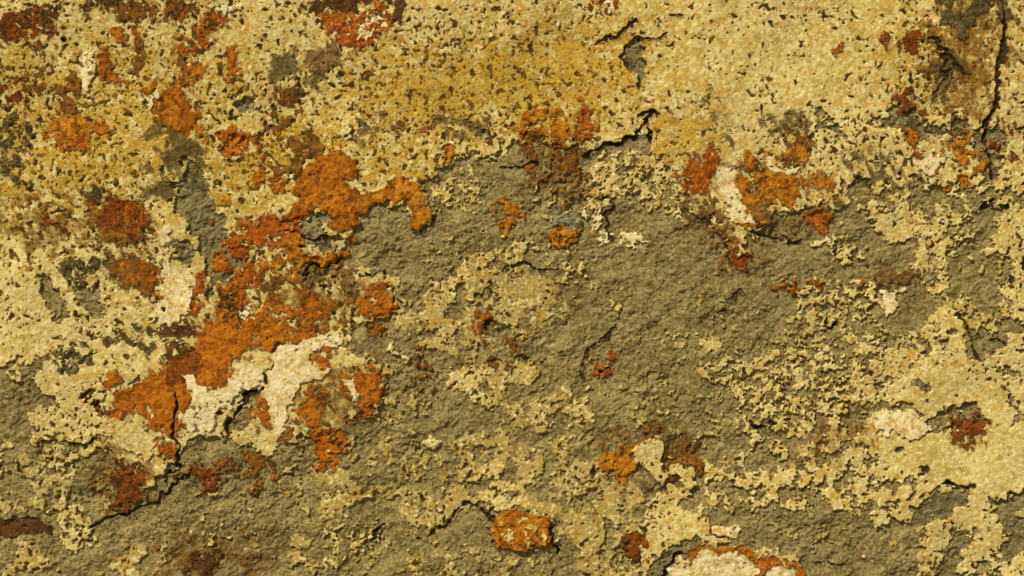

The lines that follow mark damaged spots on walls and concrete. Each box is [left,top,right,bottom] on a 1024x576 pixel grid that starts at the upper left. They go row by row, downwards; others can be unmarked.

corrosion [0,1,114,154]
corrosion [78,0,437,523]
corrosion [492,8,600,235]
crack [583,109,660,158]
crack [589,14,683,50]
corrosion [672,112,847,285]
peeling [870,104,971,144]
spalling [0,120,1024,576]
crack [82,394,192,528]
corrosion [596,409,705,490]
corrosion [948,409,991,456]
corrosion [620,530,649,570]